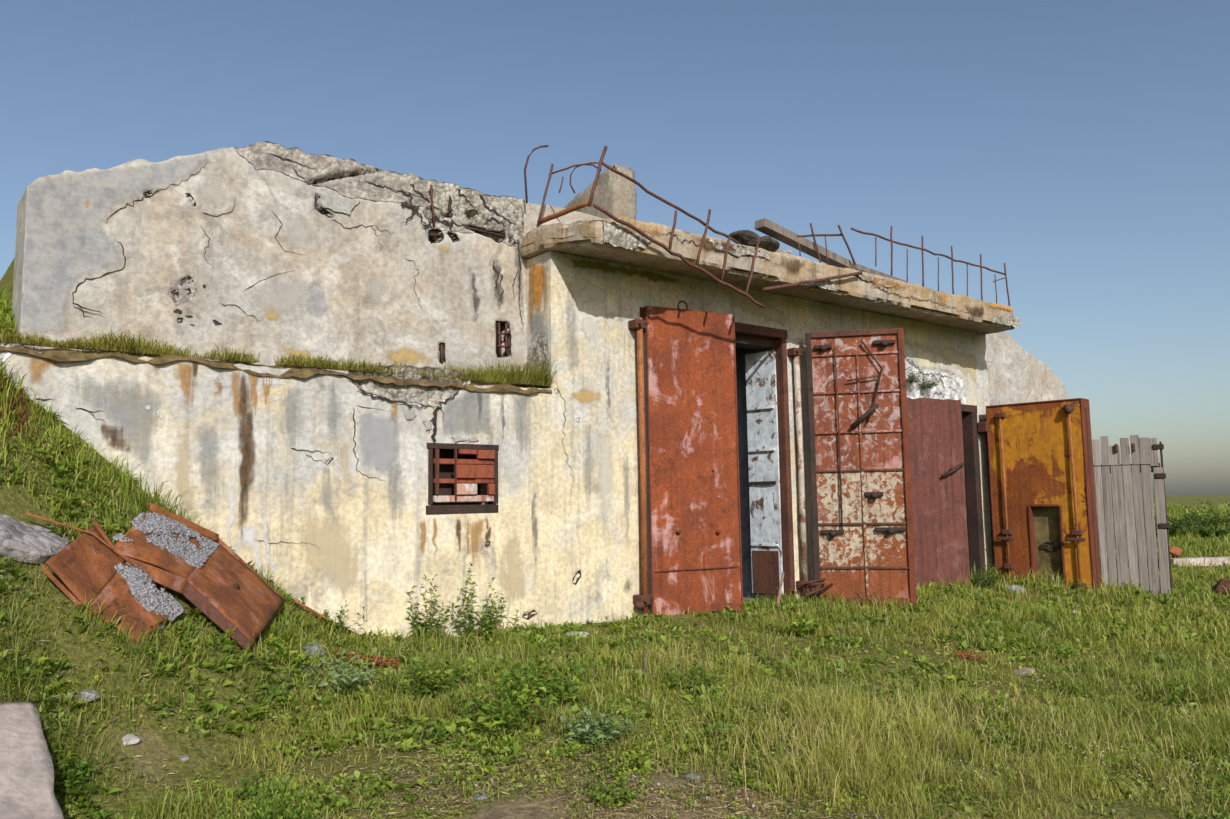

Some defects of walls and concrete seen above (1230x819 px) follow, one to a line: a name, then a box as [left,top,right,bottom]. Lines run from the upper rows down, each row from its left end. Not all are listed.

spalling [235,141,524,247]
peeling [0,157,206,366]
spalling [492,262,512,357]
rust [528,265,546,330]
spalling [603,219,654,250]
rust [700,238,736,251]
spalling [708,238,770,260]
rust [783,259,804,272]
spalling [803,279,837,291]
spalling [527,333,559,394]